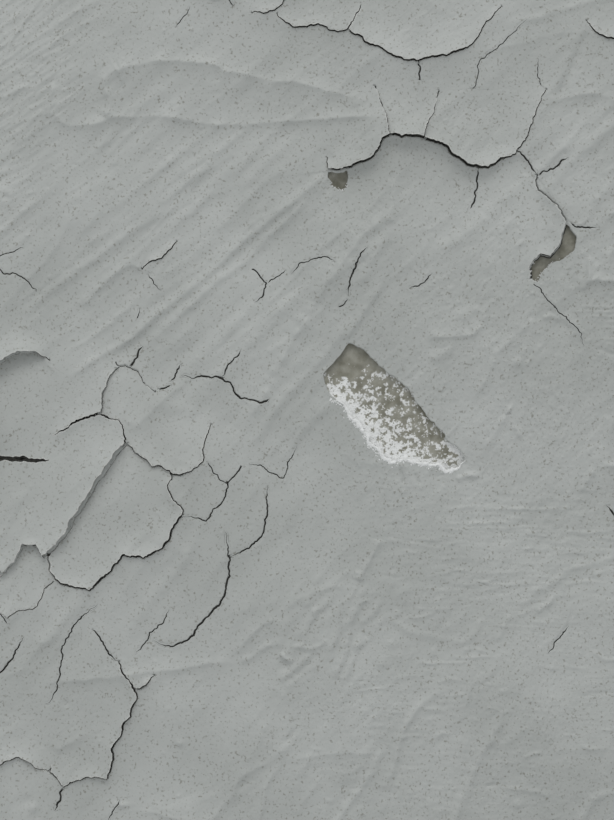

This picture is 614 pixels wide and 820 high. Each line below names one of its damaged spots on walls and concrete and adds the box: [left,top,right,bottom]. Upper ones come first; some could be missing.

peeling [247,0,596,346]
crack [0,246,38,295]
crack [147,274,162,291]
peeling [140,236,178,270]
crack [249,246,369,309]
crack [158,349,285,419]
peeling [319,340,467,474]
peeling [0,310,213,625]
crack [45,446,298,705]
crack [0,636,25,676]
peeling [0,660,155,811]